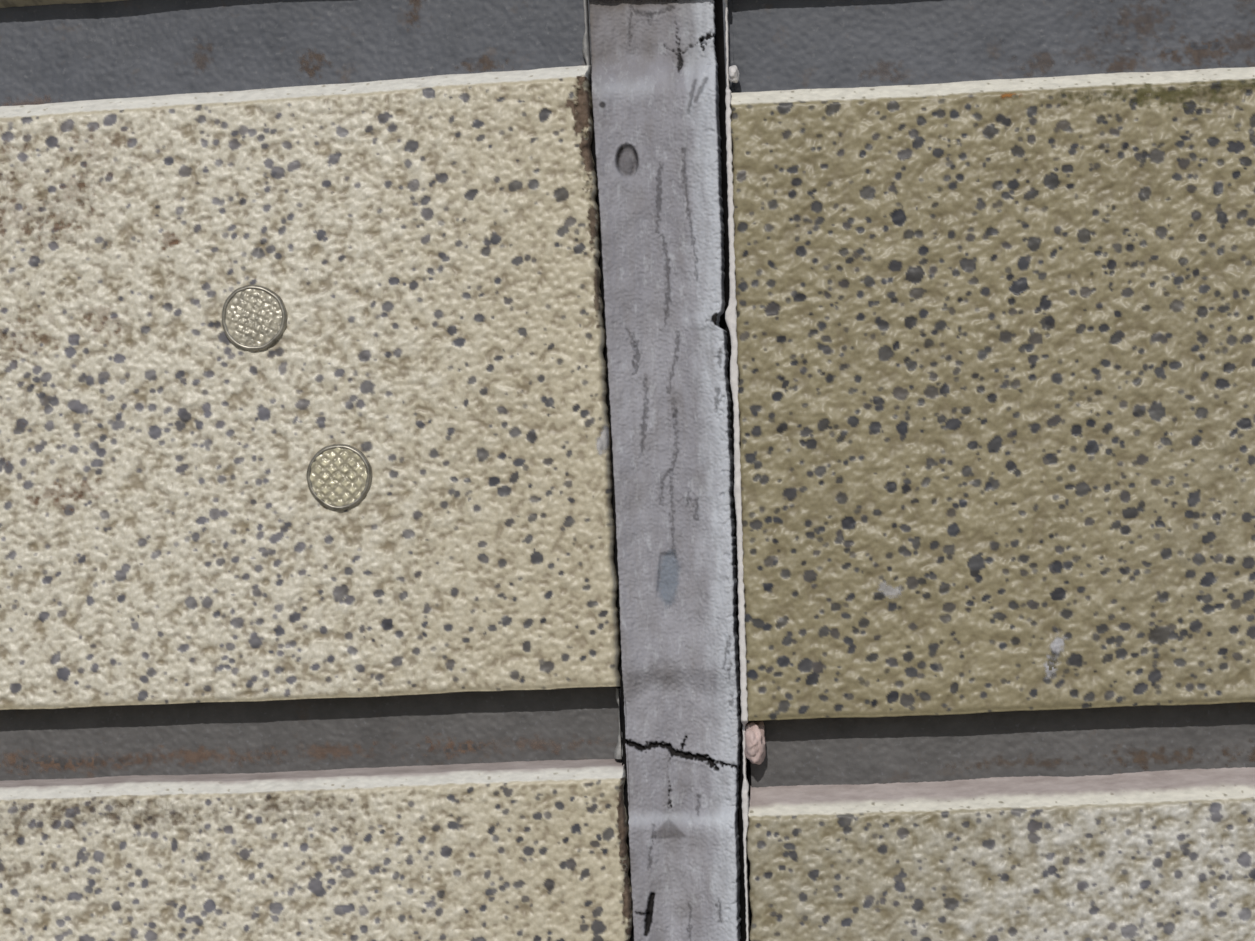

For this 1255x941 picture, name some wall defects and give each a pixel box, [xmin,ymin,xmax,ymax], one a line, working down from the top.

crack [672,36,693,71]
crack [626,736,737,770]